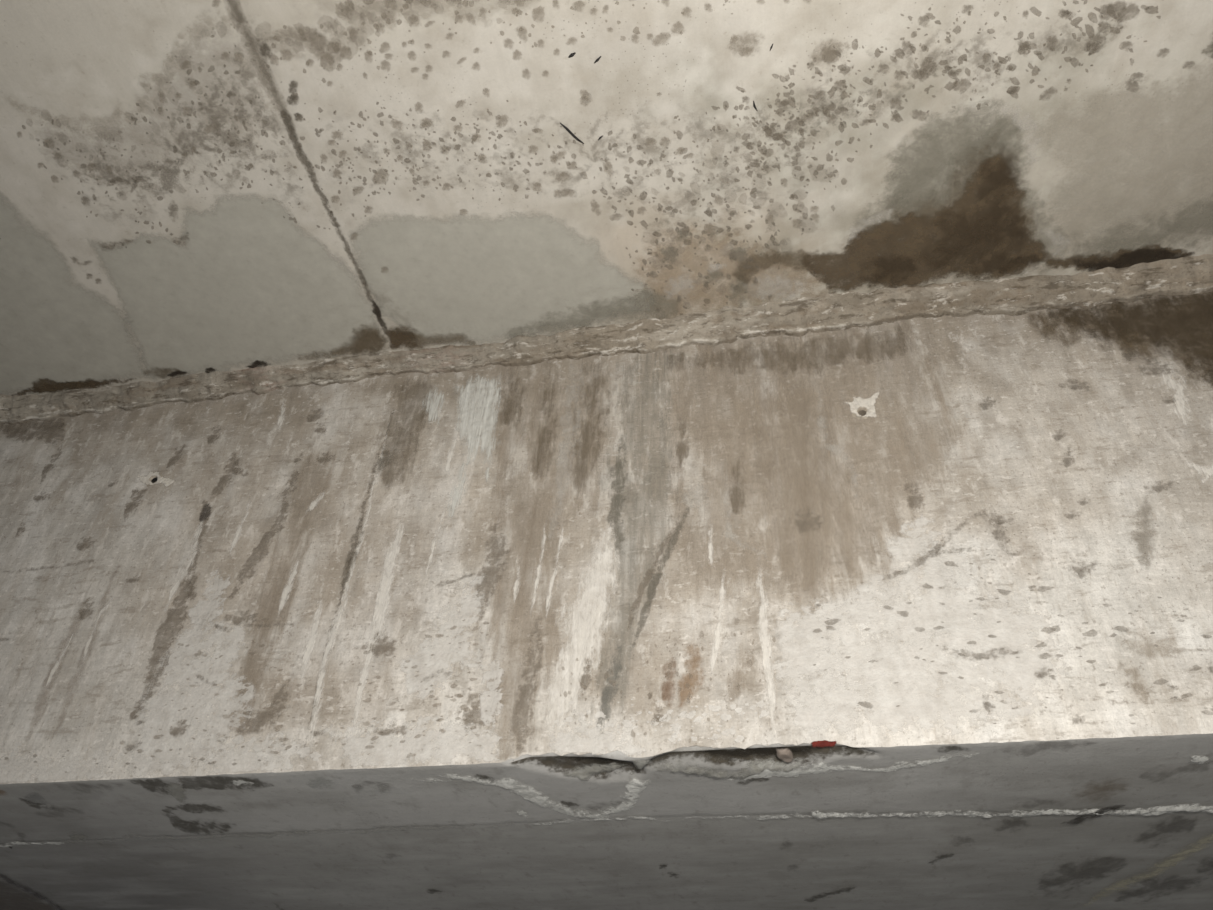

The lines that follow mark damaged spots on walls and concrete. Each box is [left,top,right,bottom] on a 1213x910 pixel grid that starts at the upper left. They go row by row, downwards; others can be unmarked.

crack [228,0,387,334]
leakage [708,127,1191,293]
leakage [1036,291,1213,381]
leakage [130,460,247,719]
leakage [226,562,298,639]
leakage [354,528,403,724]
leakage [426,376,510,574]
leakage [477,503,563,748]
leakage [629,488,689,630]
peeling [324,516,1069,781]
leakage [758,579,776,735]
crack [1063,805,1121,824]